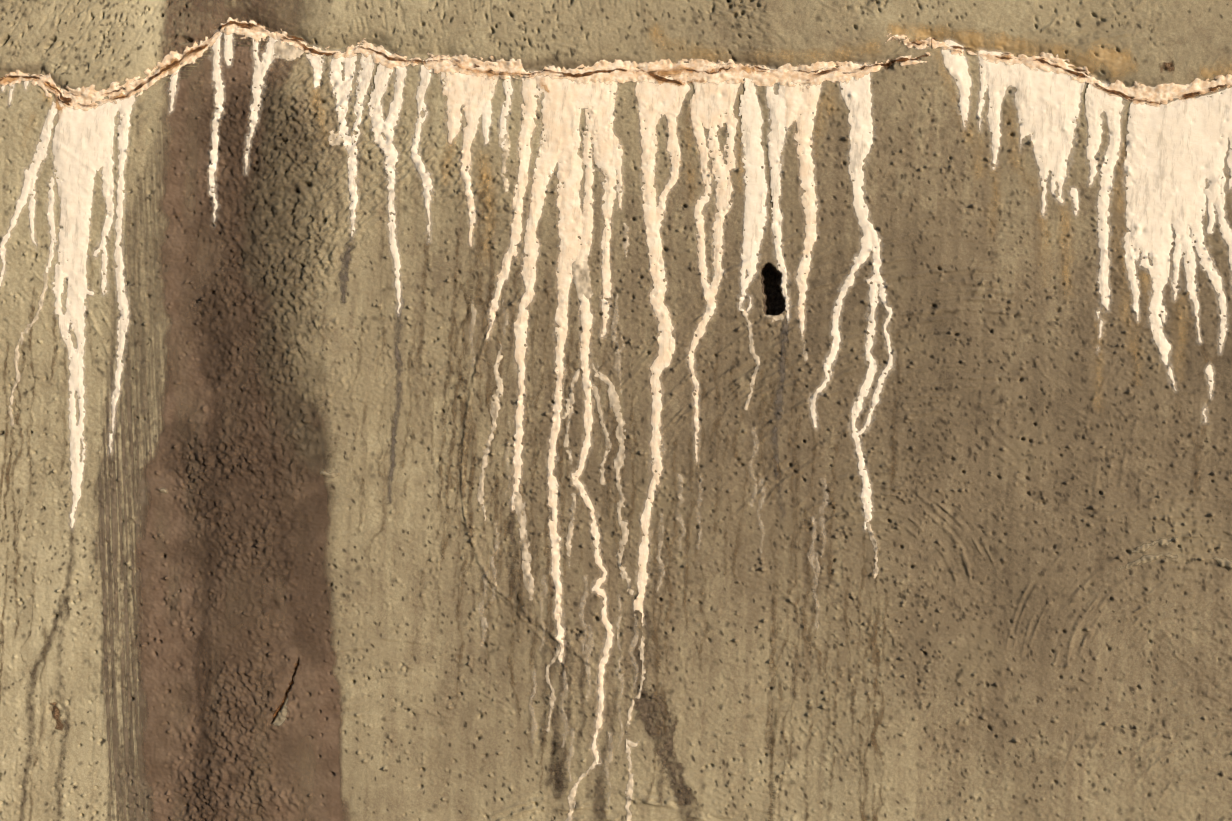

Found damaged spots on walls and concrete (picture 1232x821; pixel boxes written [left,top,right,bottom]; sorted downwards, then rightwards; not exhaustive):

leakage [0,0,822,821]
crack [0,17,1232,111]
leakage [810,64,899,589]
leakage [942,40,1232,434]
leakage [852,602,888,771]